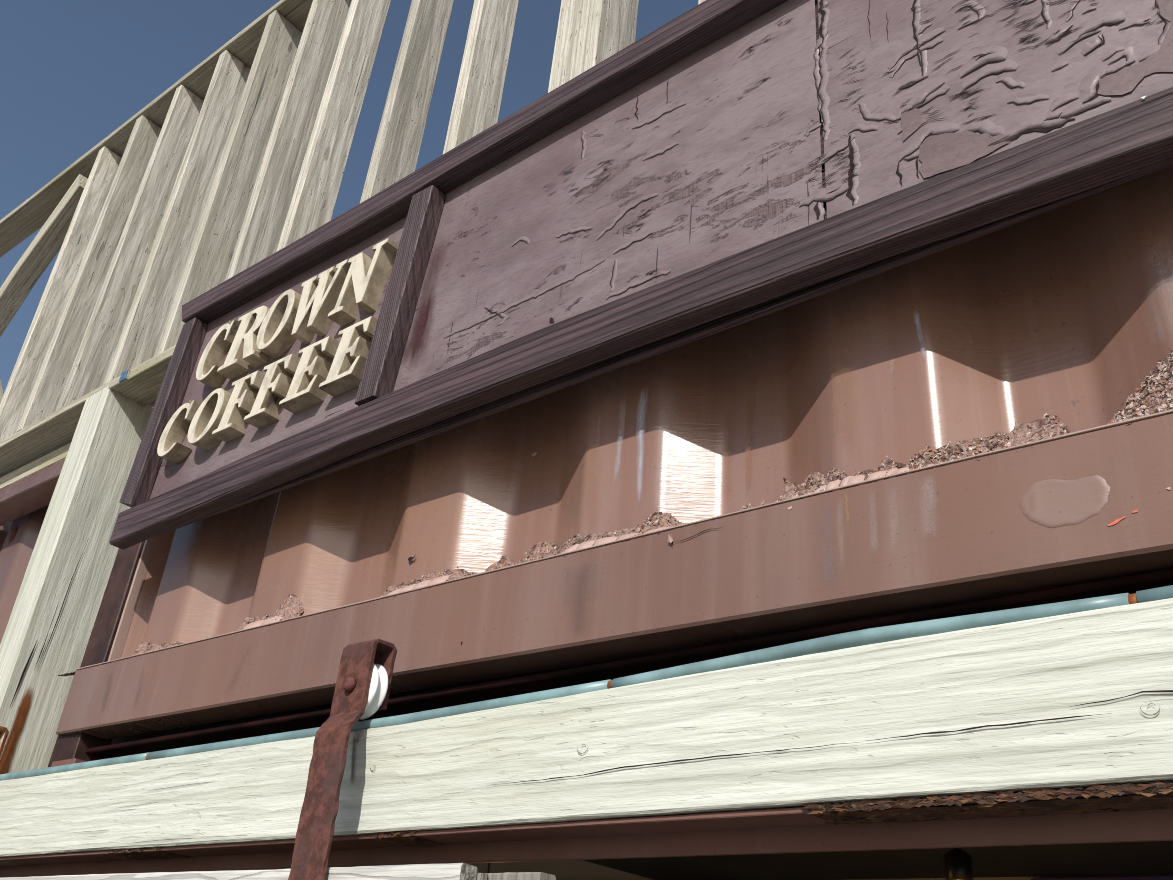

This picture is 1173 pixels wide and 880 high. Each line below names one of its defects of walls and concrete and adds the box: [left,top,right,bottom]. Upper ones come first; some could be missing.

crack [632,82,686,161]
crack [737,0,1170,219]
crack [444,131,671,338]
crack [493,690,1173,785]